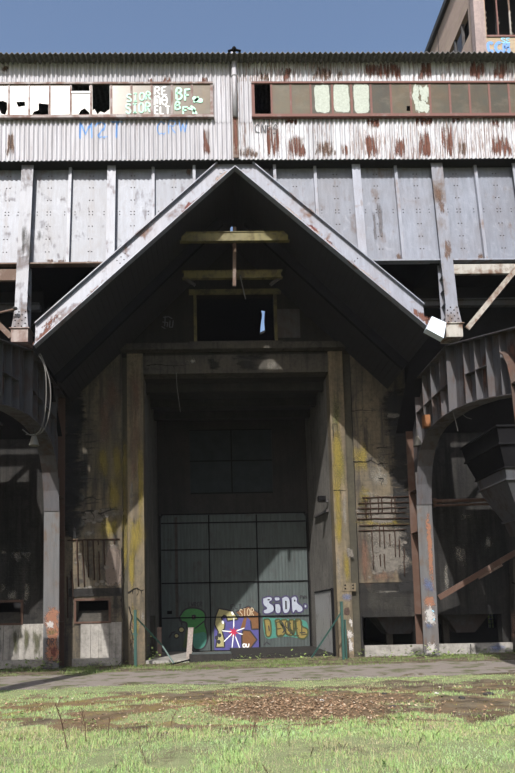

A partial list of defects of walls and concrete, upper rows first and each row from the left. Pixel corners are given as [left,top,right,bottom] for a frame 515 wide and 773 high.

corrosion [313,67,342,81]
corrosion [365,63,401,81]
corrosion [418,62,431,79]
corrosion [470,61,484,80]
corrosion [494,63,508,79]
corrosion [233,117,348,158]
corrosion [365,119,380,157]
corrosion [394,137,405,157]
corrosion [415,118,433,156]
corrosion [441,118,466,156]
corrosion [492,120,512,156]